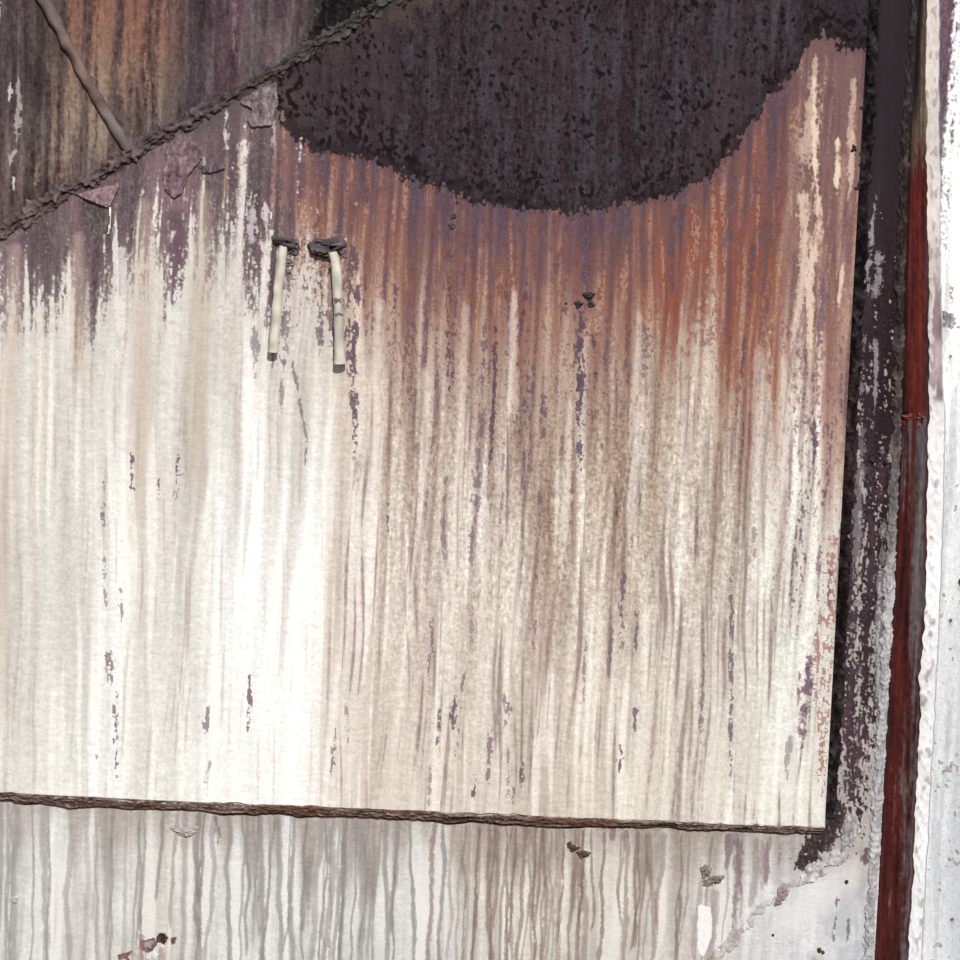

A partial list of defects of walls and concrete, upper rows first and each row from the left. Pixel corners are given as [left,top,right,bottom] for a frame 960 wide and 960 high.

water stain [108,197,162,554]
water stain [183,109,270,533]
water stain [412,366,433,628]
corrosion [0,0,869,798]
water stain [443,301,473,670]
water stain [505,289,521,434]
water stain [623,311,644,580]
water stain [745,53,857,631]
corrosion [0,444,891,930]
peeling [117,933,177,960]
water stain [0,801,774,960]
corrosion [832,896,851,942]